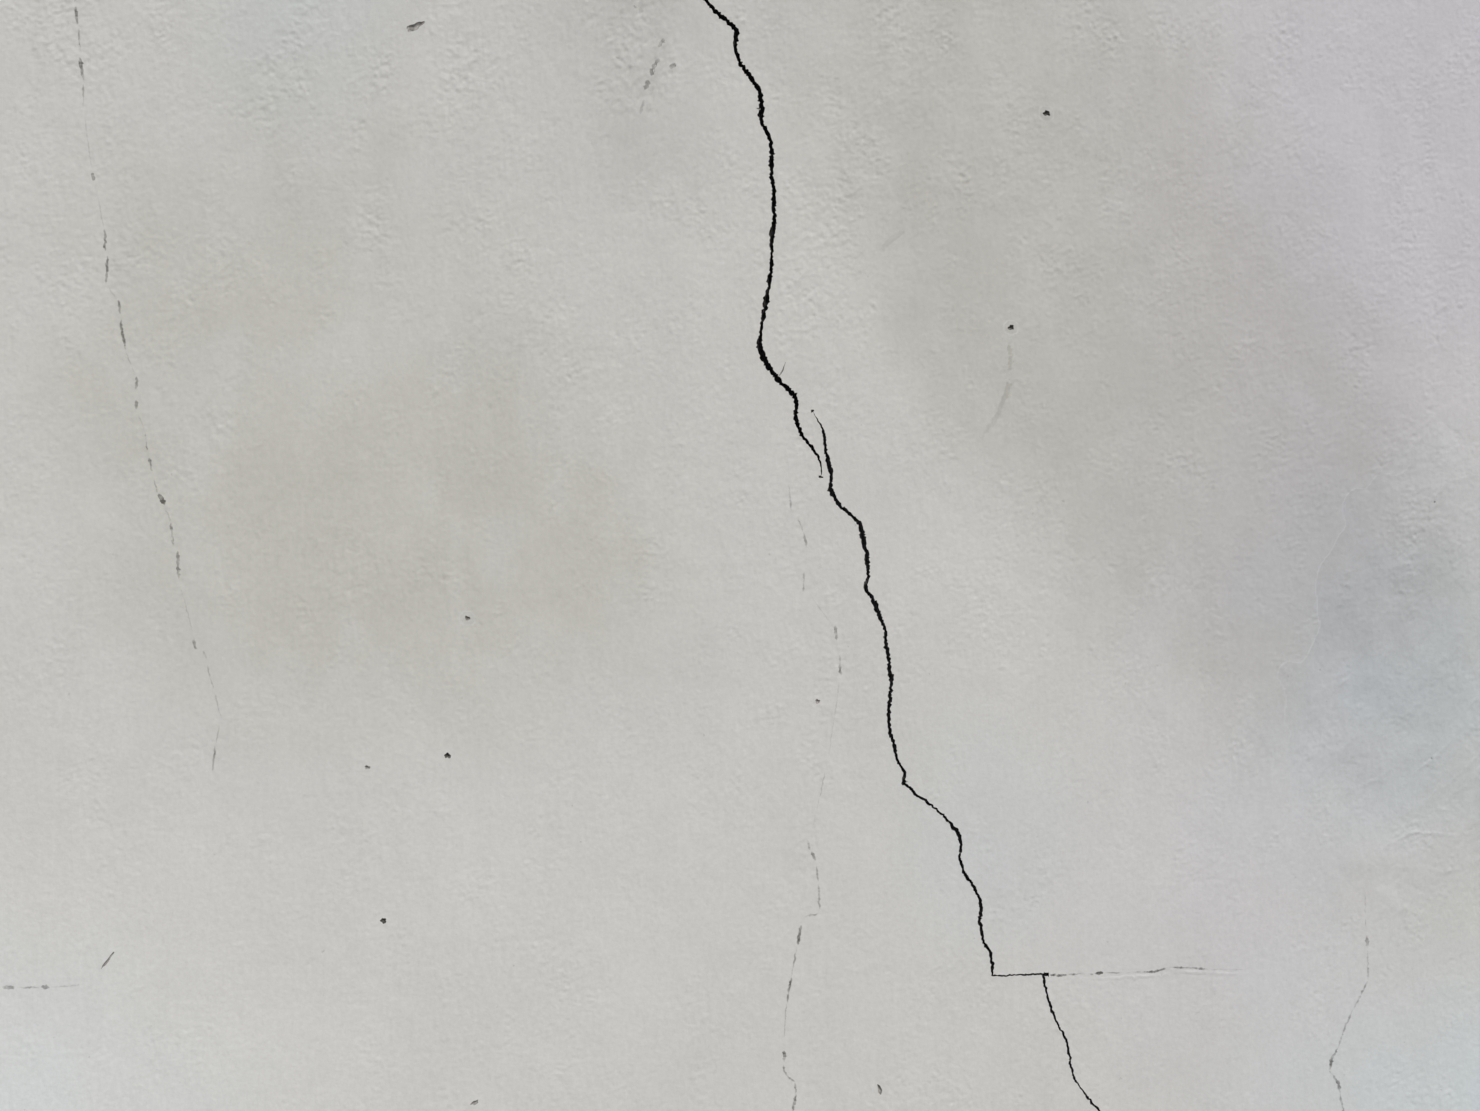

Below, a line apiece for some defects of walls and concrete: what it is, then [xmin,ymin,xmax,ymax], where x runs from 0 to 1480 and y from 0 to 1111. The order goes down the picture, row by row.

crack [700,0,1264,1111]